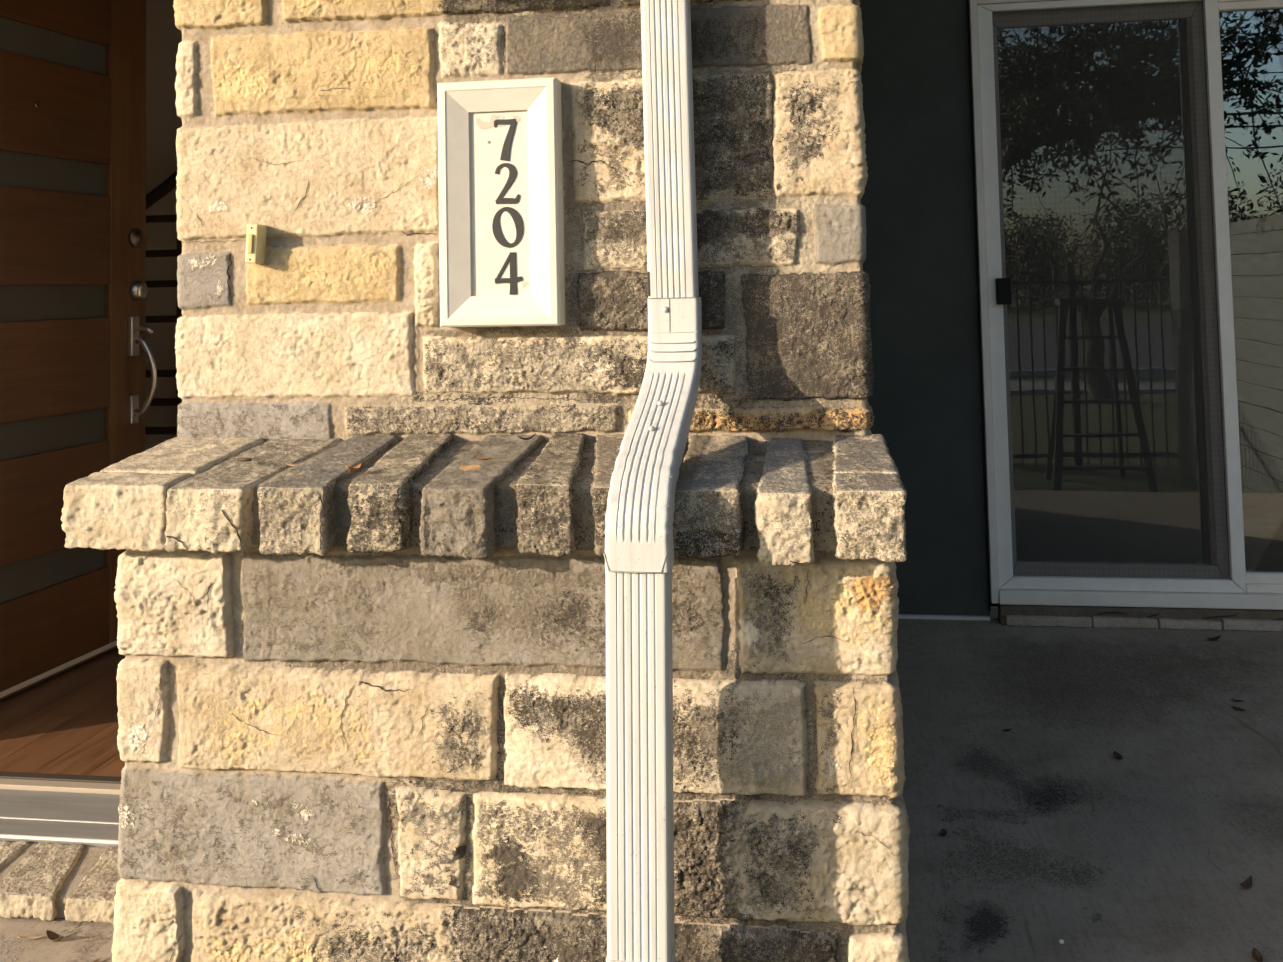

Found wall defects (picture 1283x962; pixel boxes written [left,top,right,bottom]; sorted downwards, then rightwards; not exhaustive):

damp [171,0,648,962]
damp [672,0,907,962]
crack [340,681,431,747]
crack [848,689,856,781]
damp [931,823,1110,962]